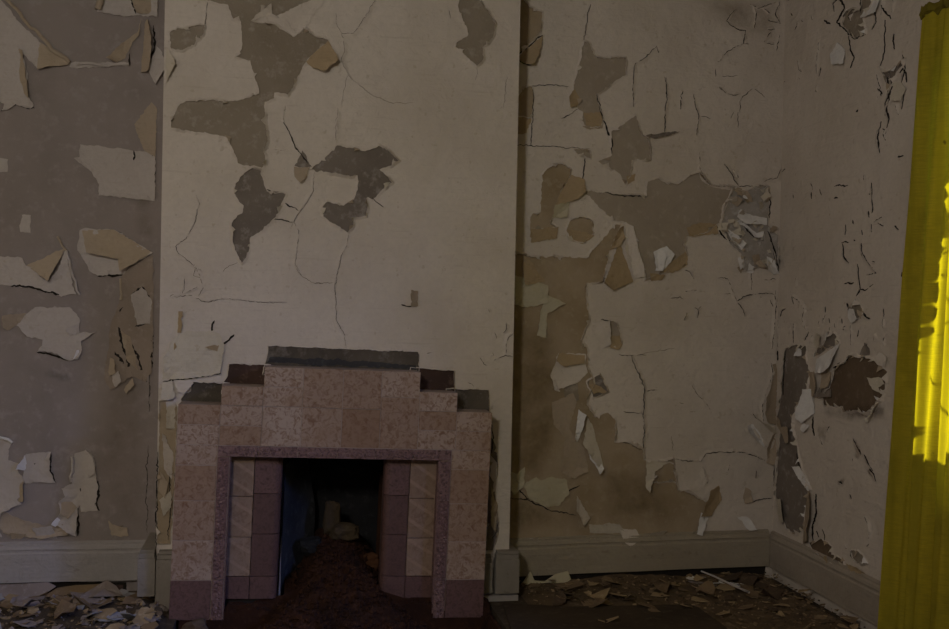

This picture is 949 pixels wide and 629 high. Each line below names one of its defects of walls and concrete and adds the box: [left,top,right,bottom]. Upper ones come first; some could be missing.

peeling [0,228,155,394]
peeling [0,0,207,111]
peeling [74,0,338,265]
peeling [283,122,401,235]
peeling [486,0,780,551]
crack [632,46,660,107]
crack [793,175,899,296]
crack [831,0,896,29]
crack [856,55,906,162]
spalling [155,344,490,546]
crack [616,351,775,485]
peeling [743,330,889,574]